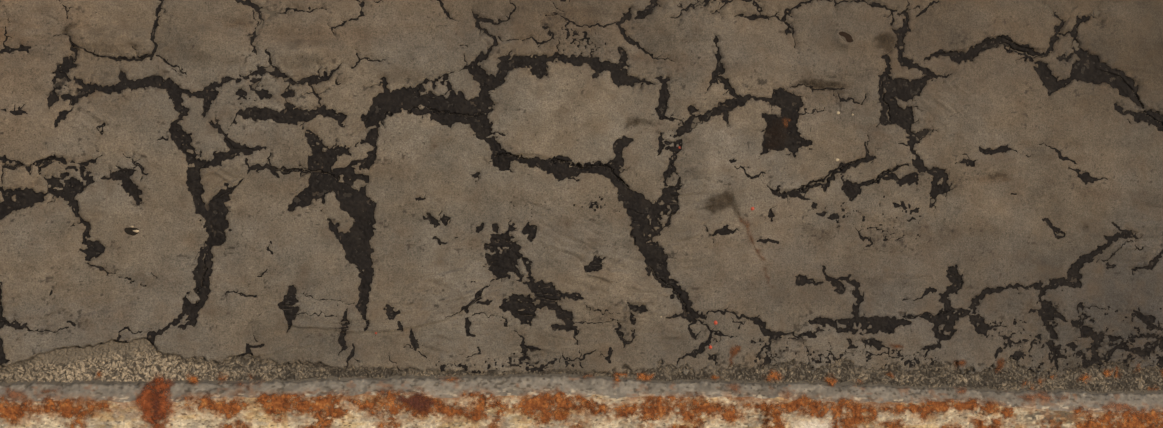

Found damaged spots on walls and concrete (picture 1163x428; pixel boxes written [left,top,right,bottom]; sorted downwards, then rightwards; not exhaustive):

peeling [54,109,72,128]
crack [0,150,148,284]
crack [47,0,341,345]
peeling [234,96,347,128]
crack [245,0,1163,371]
peeling [752,87,813,158]
peeling [955,144,1031,167]
crack [0,282,69,365]
spalling [0,194,1163,393]
corrosion [0,388,111,428]
corrosion [136,375,1014,428]
corrosion [1022,376,1163,428]